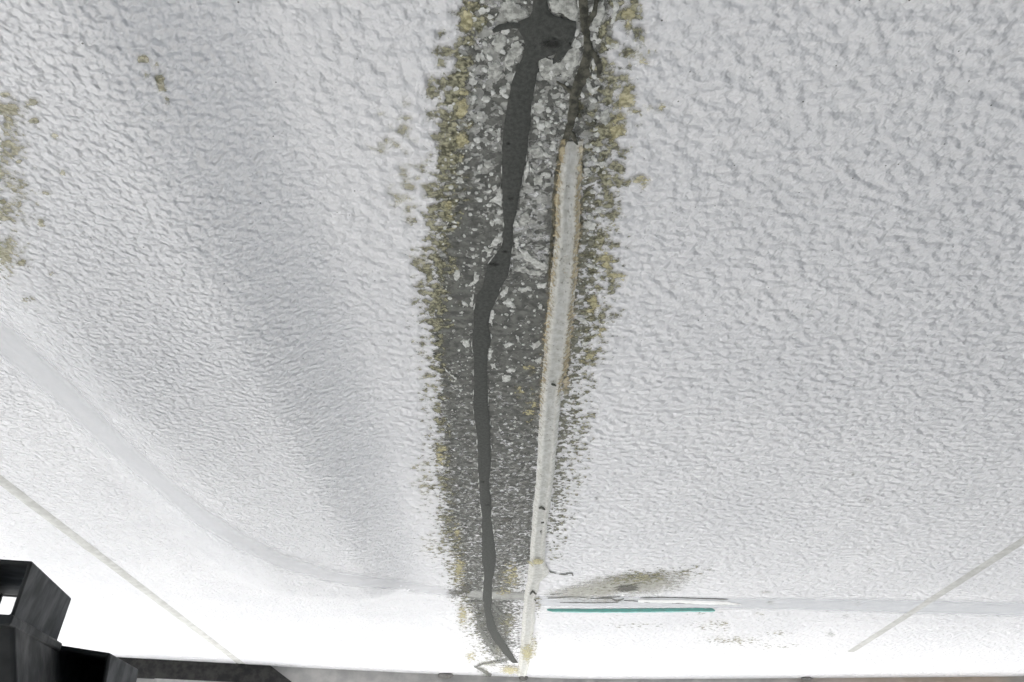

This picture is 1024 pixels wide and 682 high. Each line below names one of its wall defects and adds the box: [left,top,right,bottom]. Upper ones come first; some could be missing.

water stain [0,93,39,285]
water stain [395,0,537,674]
crack [466,0,603,677]
water stain [499,0,656,595]
water stain [558,565,710,602]